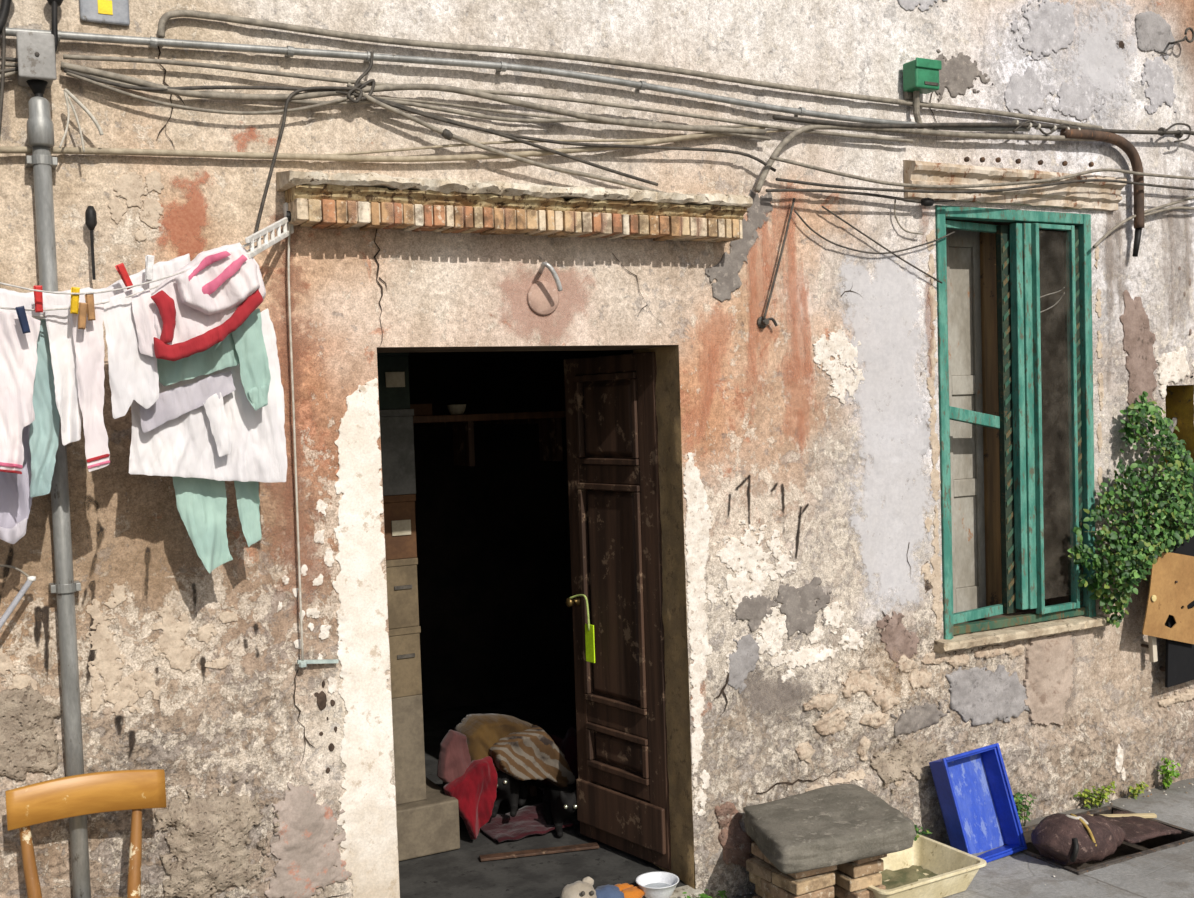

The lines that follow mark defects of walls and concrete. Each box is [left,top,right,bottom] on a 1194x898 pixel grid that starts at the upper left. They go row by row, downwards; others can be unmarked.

flaking render [898,0,948,12]
flaking render [934,0,1107,121]
flaking render [1141,54,1177,115]
flaking render [705,189,773,302]
crack [374,229,387,346]
peeling [813,328,865,404]
water stain [41,606,50,671]
peeling [277,378,400,898]
peeling [683,452,920,868]
peeling [1157,689,1194,707]
peeling [1115,744,1126,781]